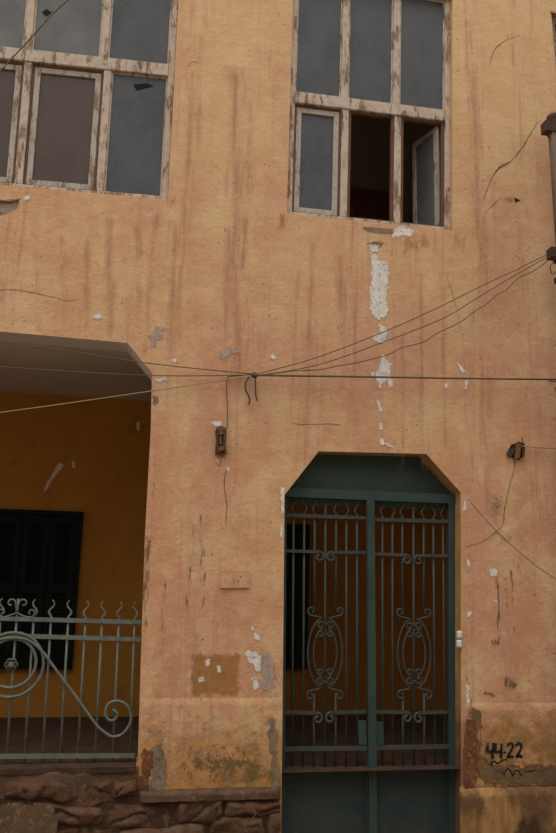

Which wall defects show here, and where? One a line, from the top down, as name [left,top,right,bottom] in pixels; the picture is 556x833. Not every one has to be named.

flaking render [0,195,30,216]
peeling [363,225,415,344]
peeling [371,355,394,412]
peeling [245,650,277,693]
leakage [178,746,259,783]
flaking render [462,684,556,789]